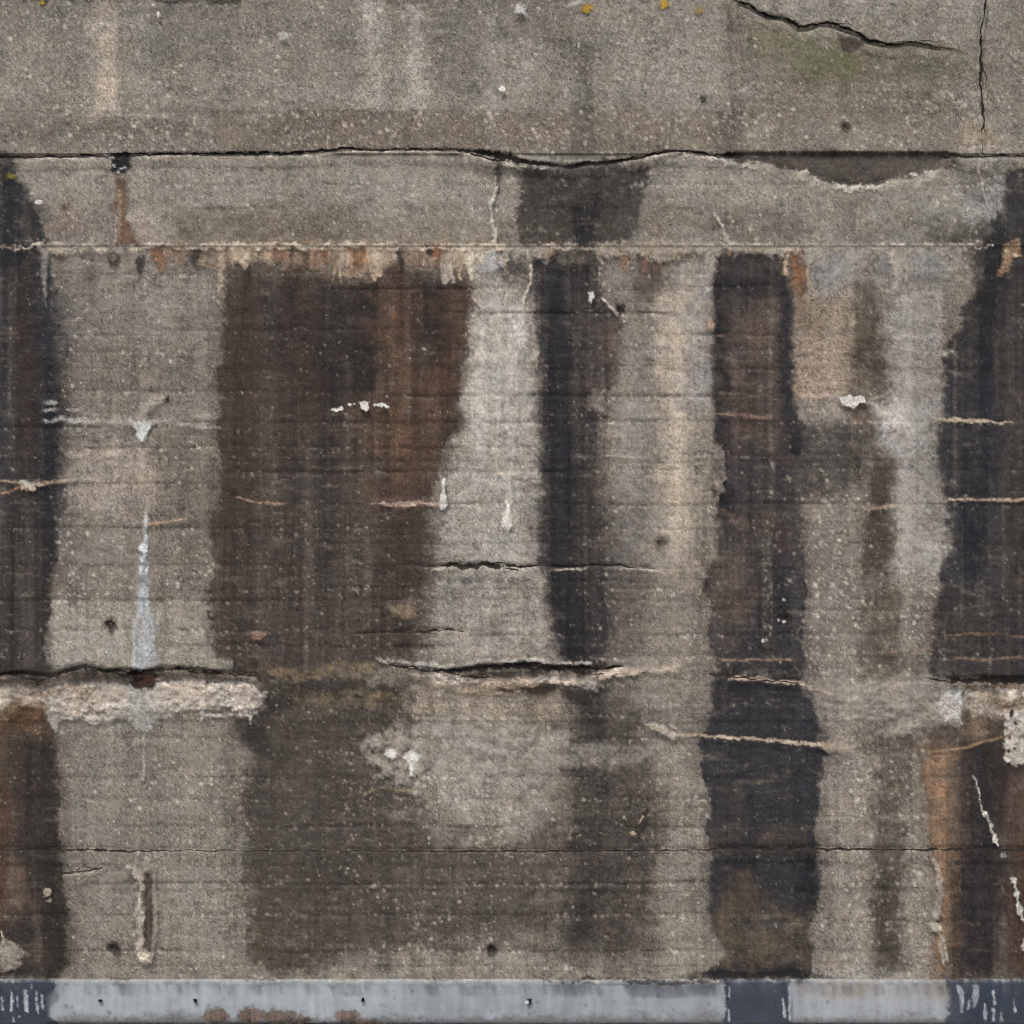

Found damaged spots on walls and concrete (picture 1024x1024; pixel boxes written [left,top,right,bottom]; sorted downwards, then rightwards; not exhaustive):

crack [735,0,1024,199]
crack [0,146,741,170]
spalling [683,149,958,195]
corrosion [108,177,509,292]
damp [185,241,446,251]
corrosion [784,244,810,298]
damp [0,153,178,677]
damp [0,260,541,974]
damp [412,157,1024,1024]
crack [0,661,255,685]
crack [389,657,625,679]